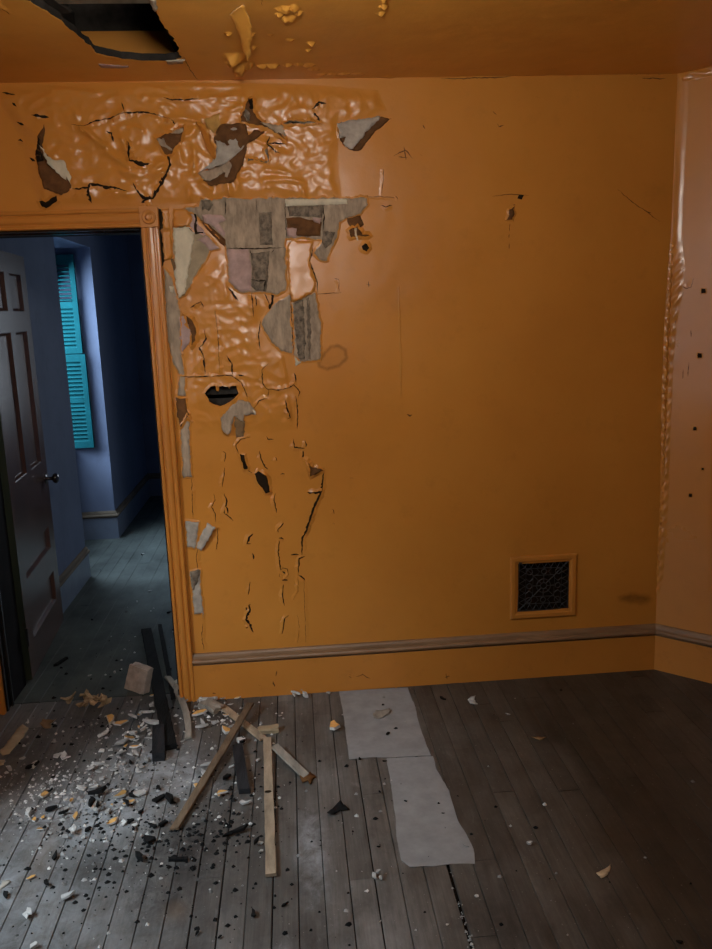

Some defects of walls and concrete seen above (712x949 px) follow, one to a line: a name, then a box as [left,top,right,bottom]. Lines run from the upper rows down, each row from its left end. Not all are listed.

spalling [68,3,165,31]
peeling [230,5,252,62]
peeling [239,96,322,144]
peeling [123,124,187,170]
peeling [245,147,271,165]
peeling [36,194,61,210]
crack [307,247,342,294]
peeling [159,194,373,480]
crack [177,287,328,634]